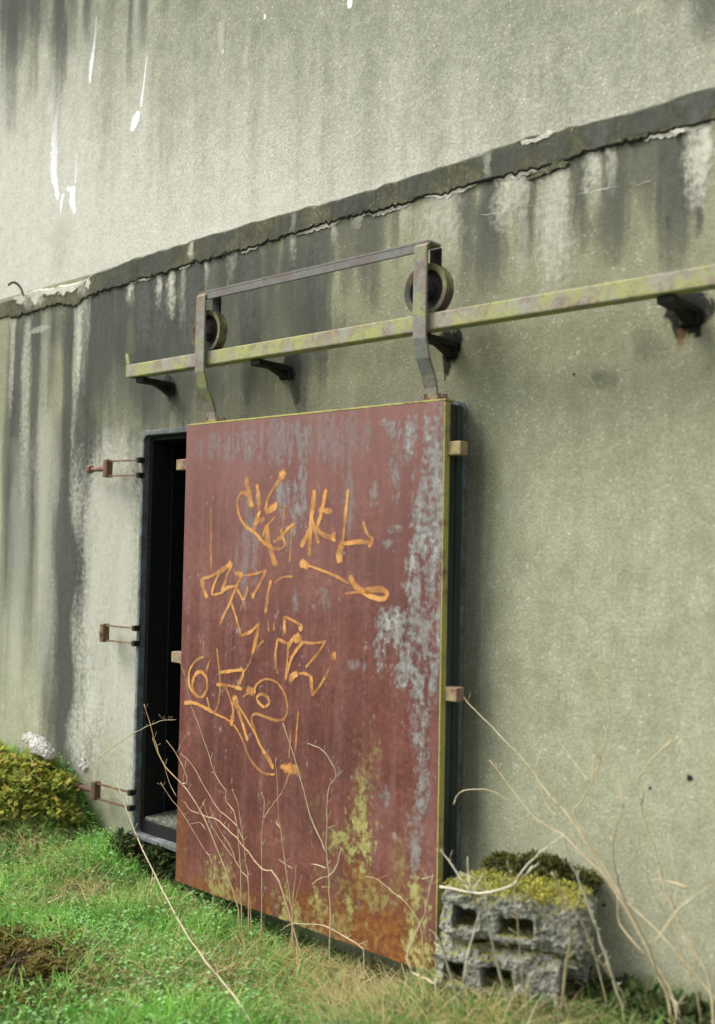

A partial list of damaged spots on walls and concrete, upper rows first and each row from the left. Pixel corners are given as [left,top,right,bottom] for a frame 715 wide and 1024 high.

damp [0,0,66,67]
damp [284,222,334,335]
crack [9,119,711,319]
damp [427,145,525,271]
damp [538,87,715,280]
damp [7,242,277,803]
peeling [376,412,443,747]
rust [192,878,271,915]
rust [296,861,435,969]